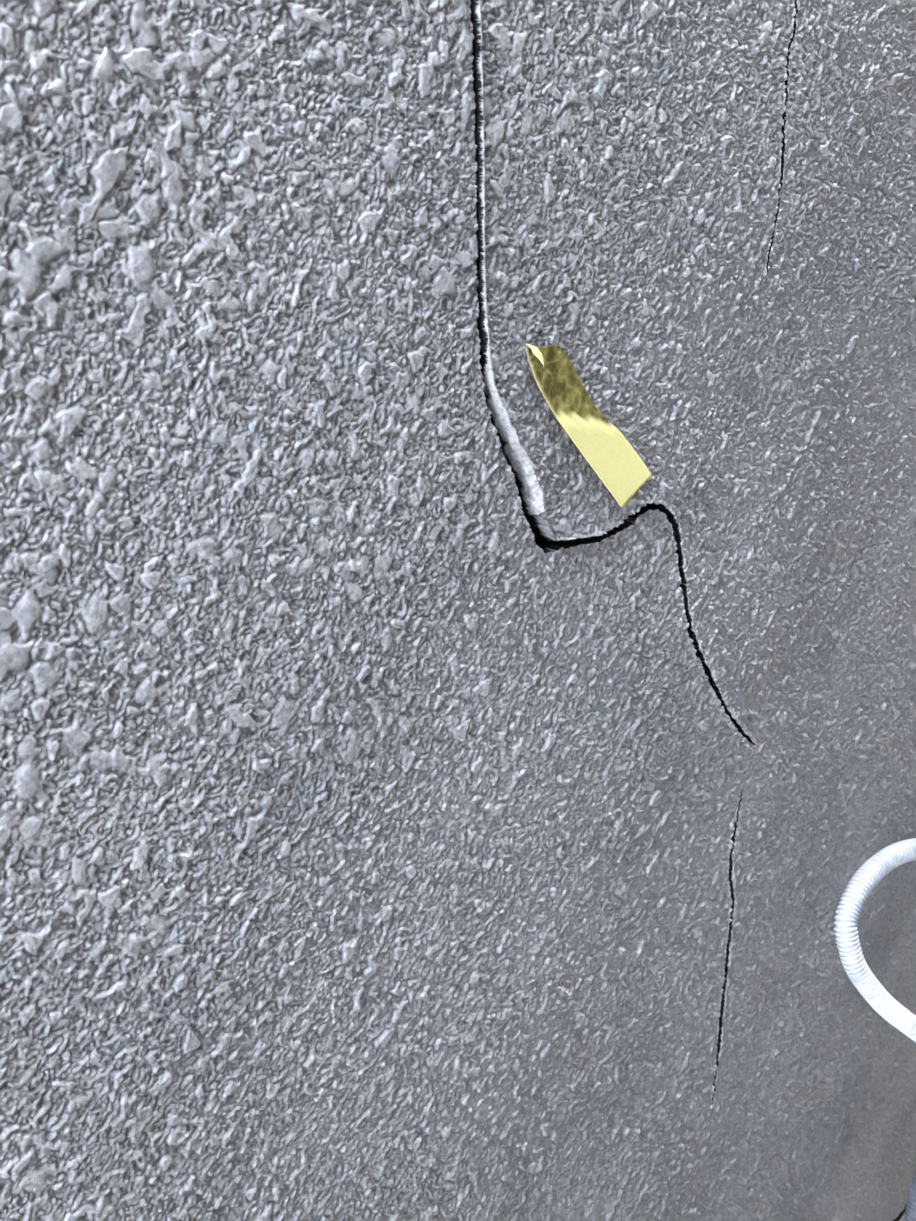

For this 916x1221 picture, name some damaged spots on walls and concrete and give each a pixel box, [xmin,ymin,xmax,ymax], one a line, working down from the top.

crack [468,0,757,750]
crack [709,787,746,1107]
crack [891,1201,907,1221]